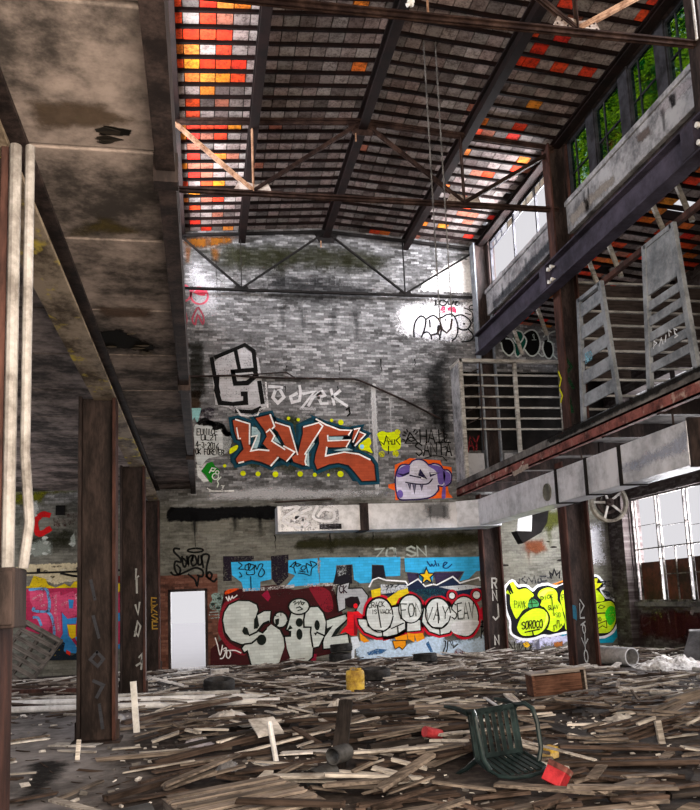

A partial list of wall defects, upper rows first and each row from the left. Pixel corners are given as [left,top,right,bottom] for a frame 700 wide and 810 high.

leakage [192,270,217,317]
leakage [200,245,387,302]
leakage [425,359,448,433]
leakage [167,488,356,526]